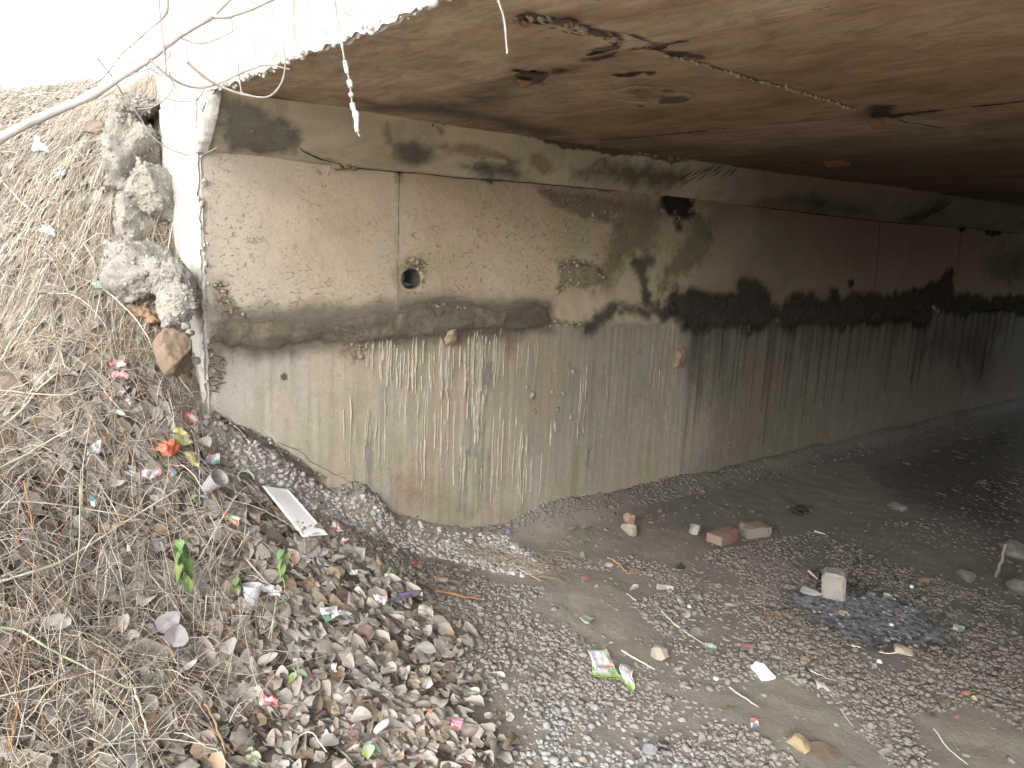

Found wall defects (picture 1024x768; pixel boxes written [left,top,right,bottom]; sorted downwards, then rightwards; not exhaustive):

crack [624,14,782,45]
leakage [220,102,299,154]
leakage [398,145,429,163]
leakage [474,163,519,176]
leakage [584,257,1024,370]
leakage [344,328,542,508]